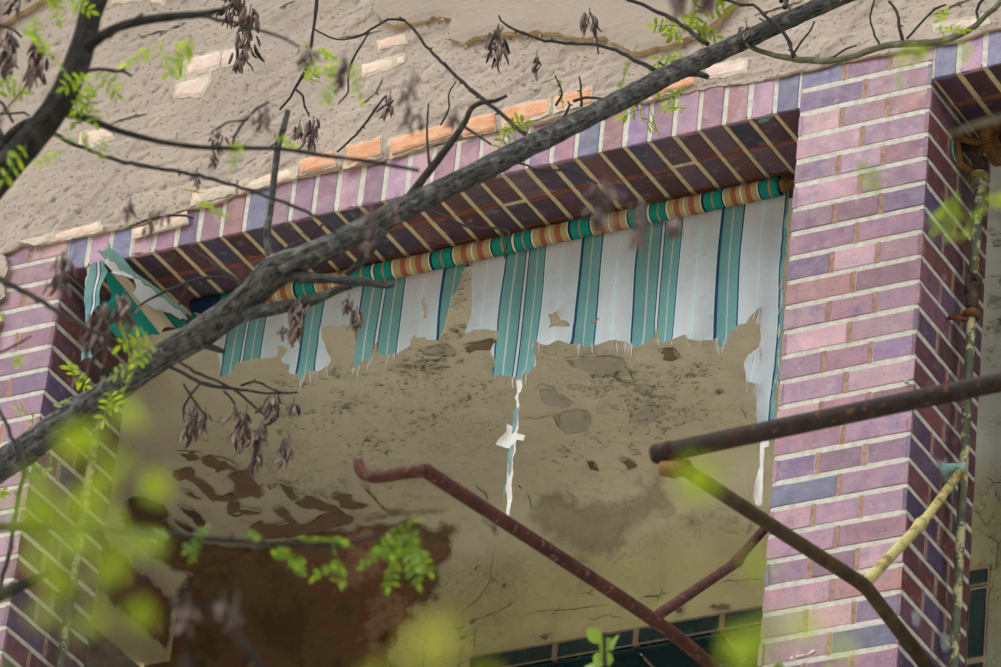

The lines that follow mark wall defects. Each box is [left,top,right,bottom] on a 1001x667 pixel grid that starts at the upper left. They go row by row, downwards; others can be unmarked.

spalling [173,47,241,99]
flaking render [361,0,740,78]
spalling [648,58,748,100]
spalling [131,85,593,239]
spalling [17,220,103,246]
peeling [346,275,506,471]
peeling [534,349,724,471]
peeling [124,438,369,540]
crack [974,477,1001,569]